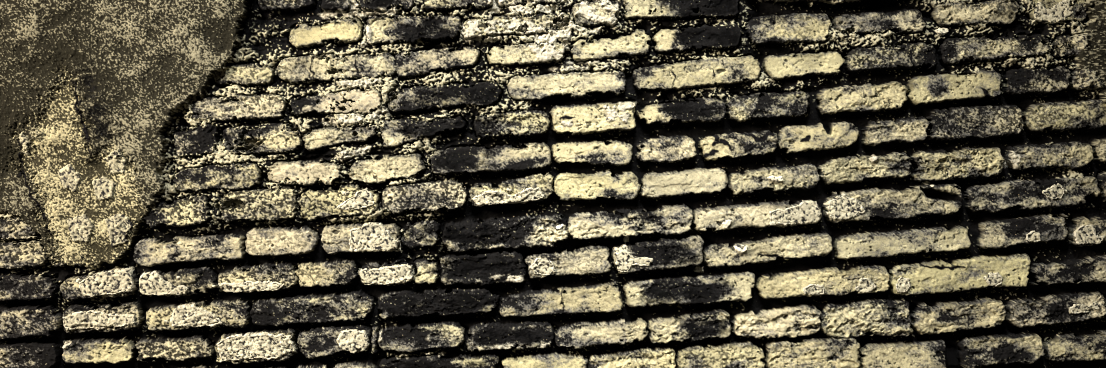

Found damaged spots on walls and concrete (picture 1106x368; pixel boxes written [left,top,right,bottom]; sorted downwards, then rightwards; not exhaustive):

spalling [1032,0,1089,50]
peeling [58,148,127,200]
spalling [472,187,545,207]
spalling [769,193,865,226]
spalling [1070,225,1105,245]
spalling [349,222,415,285]
spalling [529,258,556,275]
spalling [613,236,653,273]
spalling [212,280,284,293]
spalling [62,267,223,350]
spalling [216,330,296,363]
spalling [336,329,372,353]